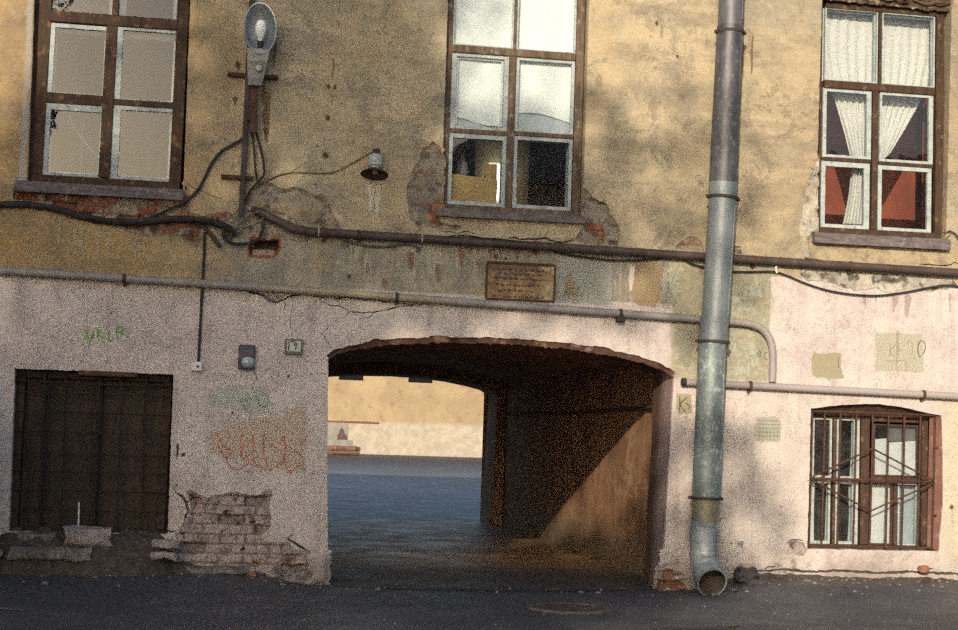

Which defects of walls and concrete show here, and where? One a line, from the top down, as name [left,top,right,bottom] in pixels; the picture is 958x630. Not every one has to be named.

spalling [830,0,954,12]
spalling [12,0,342,259]
spalling [406,141,462,232]
spalling [574,186,621,247]
flaking render [797,159,957,293]
crack [247,291,429,347]
spalling [172,489,318,576]